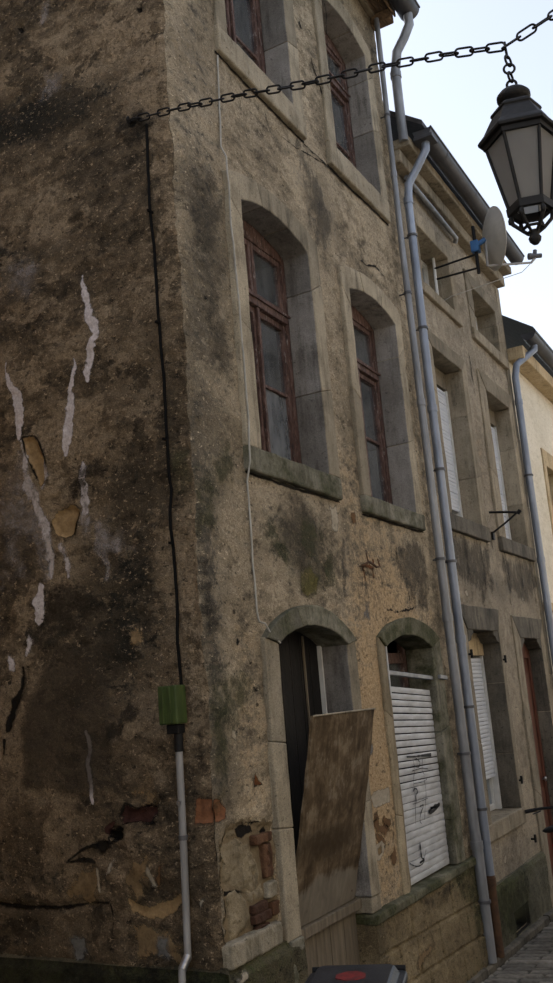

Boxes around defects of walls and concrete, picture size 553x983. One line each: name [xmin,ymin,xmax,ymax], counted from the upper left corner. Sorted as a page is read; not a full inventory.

spalling [22,435,46,486]
crack [3,667,25,755]
crack [68,840,113,862]
spalling [124,854,182,965]
spalling [194,798,283,983]